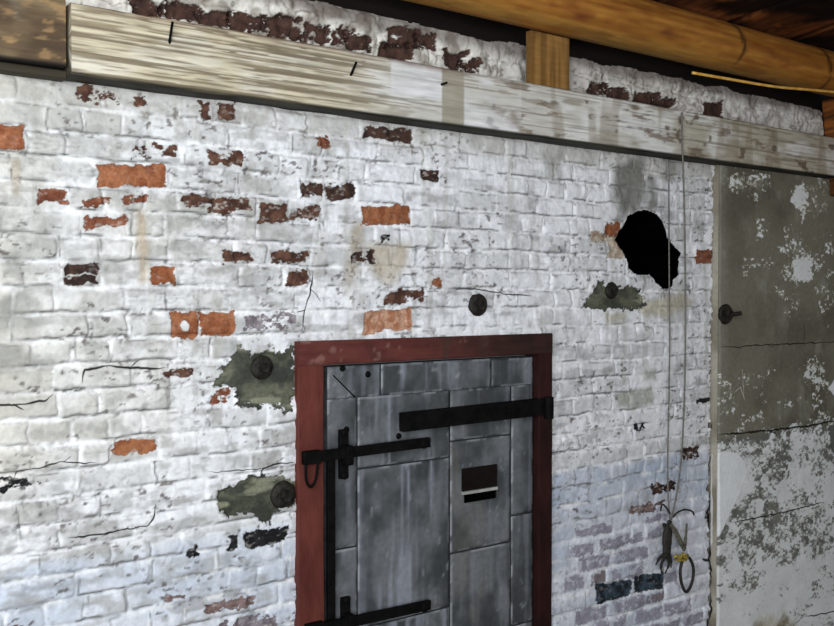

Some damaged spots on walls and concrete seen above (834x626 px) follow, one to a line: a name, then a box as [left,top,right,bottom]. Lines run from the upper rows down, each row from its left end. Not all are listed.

spalling [128,0,483,73]
peeling [80,142,178,231]
peeling [180,182,356,224]
spalling [590,210,681,289]
crack [298,275,320,329]
crack [82,360,164,381]
crack [0,394,53,410]
crack [711,421,834,435]
crack [11,456,95,483]
crack [69,504,156,538]
spalling [217,470,295,552]
peeling [696,355,834,626]